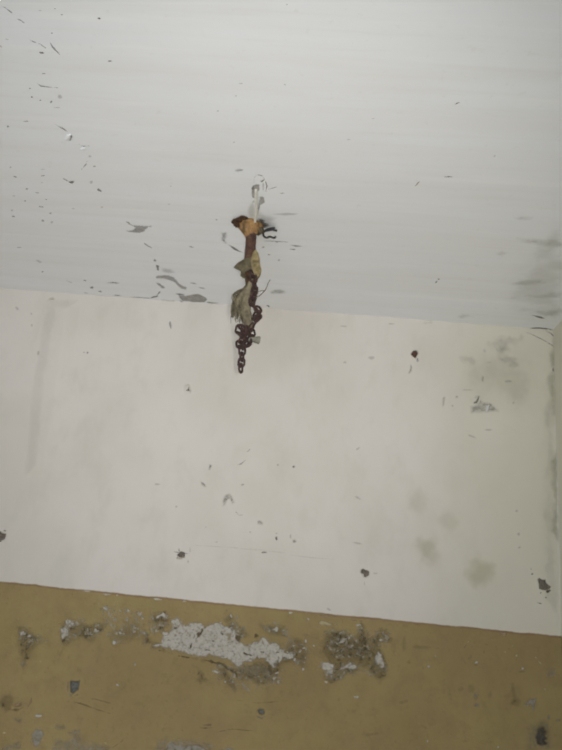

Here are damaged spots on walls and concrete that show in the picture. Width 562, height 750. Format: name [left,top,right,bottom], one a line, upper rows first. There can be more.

spalling [60,604,315,691]
spalling [319,615,391,683]